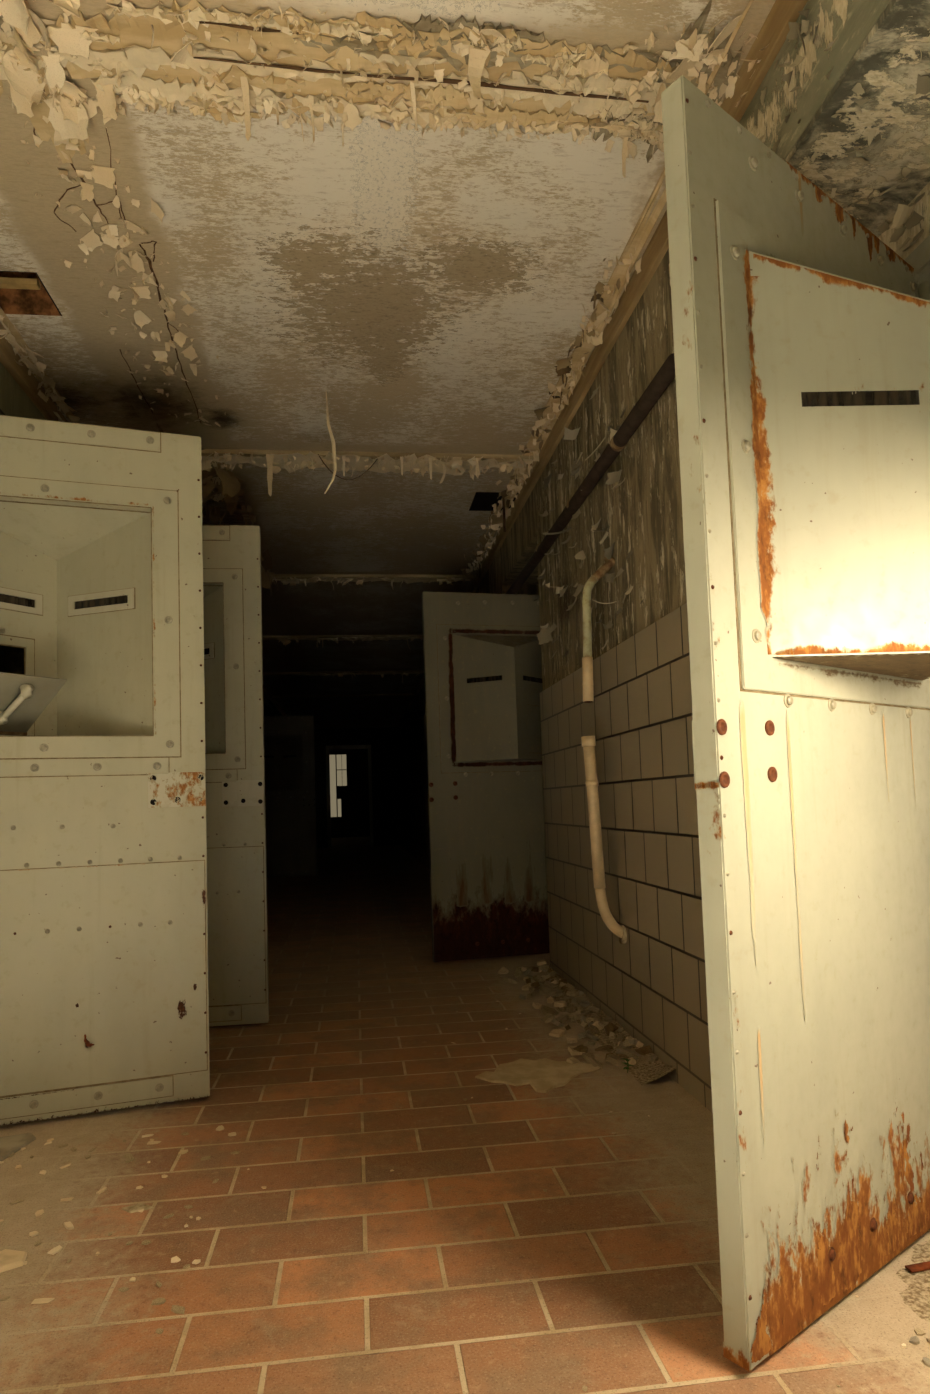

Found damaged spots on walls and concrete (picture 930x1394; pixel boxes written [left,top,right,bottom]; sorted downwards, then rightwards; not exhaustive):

water stain [238,207,549,387]
peeling [0,0,853,686]
rust [742,245,930,655]
rust [782,158,914,274]
peeling [797,16,930,260]
rust [148,772,206,808]
rust [432,832,550,962]
rust [723,1107,930,1371]